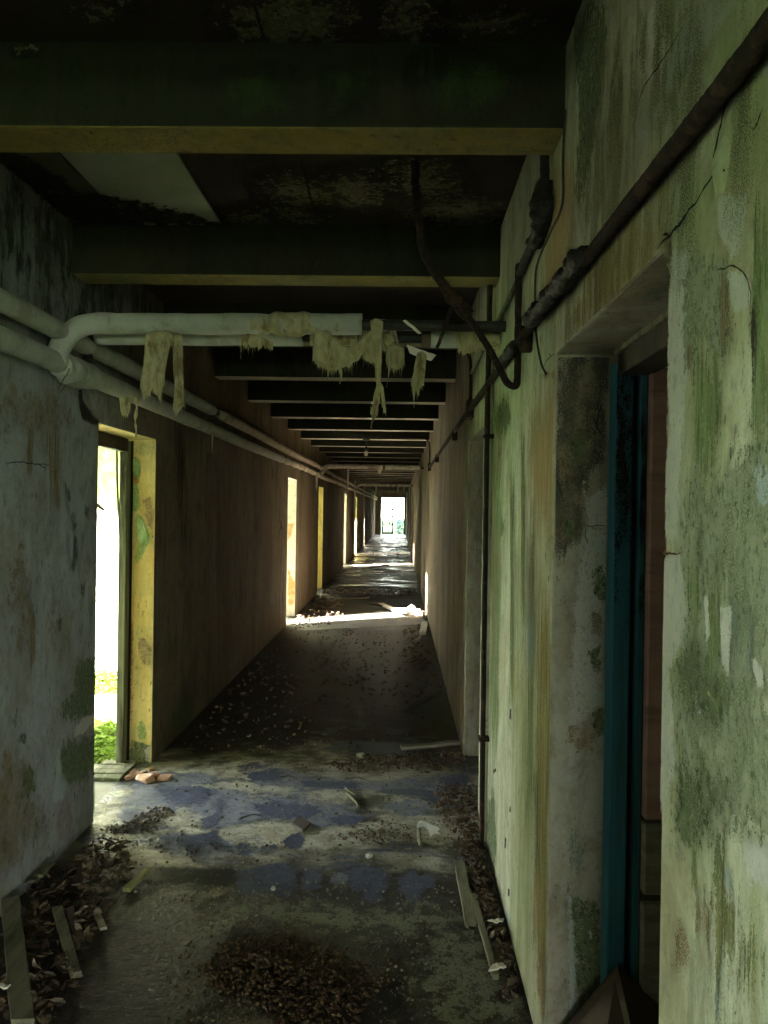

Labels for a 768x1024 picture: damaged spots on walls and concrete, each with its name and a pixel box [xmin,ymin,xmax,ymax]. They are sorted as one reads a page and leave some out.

water stain [540,0,761,289]
crack [657,101,727,250]
water stain [208,54,768,1024]
water stain [74,714,94,737]